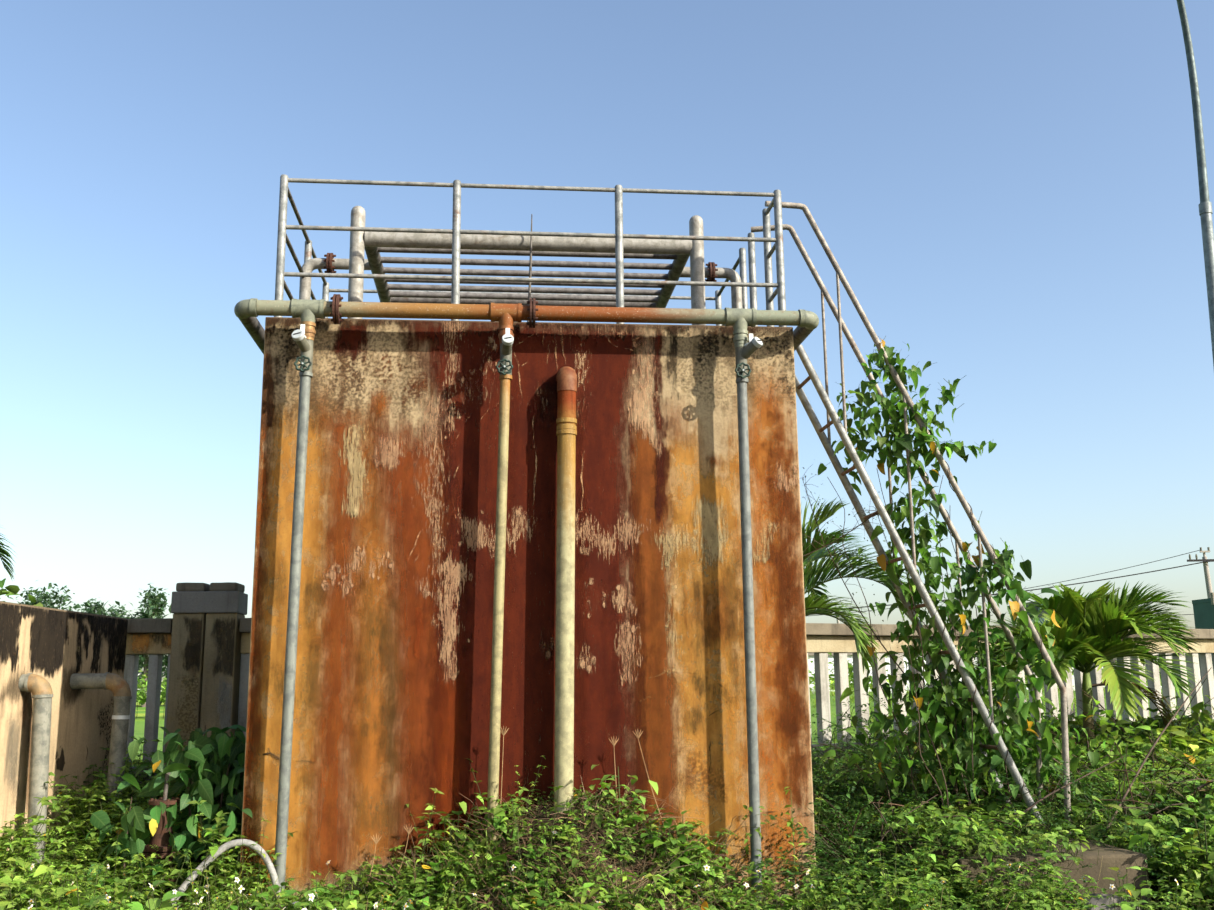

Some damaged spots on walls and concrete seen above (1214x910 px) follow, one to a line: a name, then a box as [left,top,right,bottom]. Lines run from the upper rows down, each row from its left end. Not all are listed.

leakage [0,603,128,703]
leakage [178,617,235,743]
peeling [339,321,536,684]
rust [240,320,809,886]
peeling [575,496,729,685]